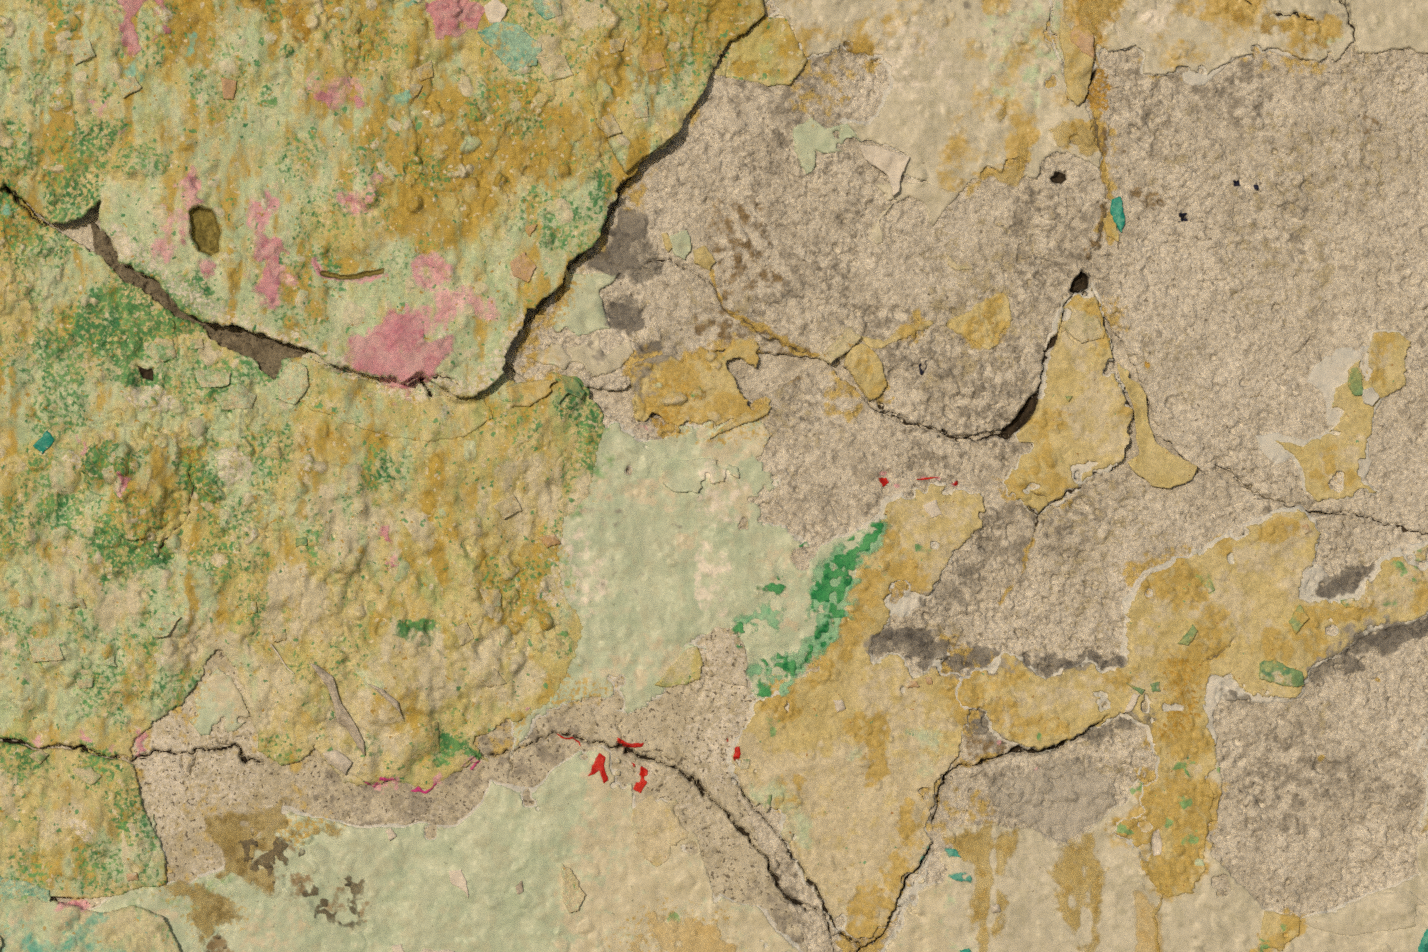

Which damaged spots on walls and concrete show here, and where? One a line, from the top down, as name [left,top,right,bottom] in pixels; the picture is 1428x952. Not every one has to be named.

crack [1089,113,1108,260]
crack [647,253,807,353]
crack [870,293,1134,442]
peeling [0,0,1119,952]
crack [1027,487,1081,526]
spalling [883,0,1428,918]
crack [1225,466,1428,568]
crack [2,738,264,777]
crack [492,723,1098,952]